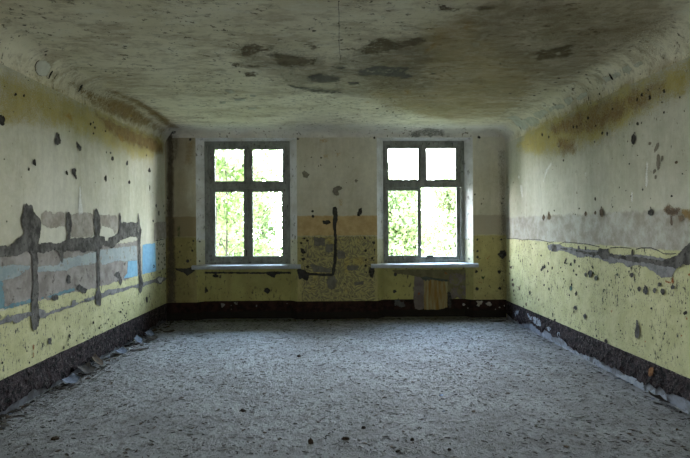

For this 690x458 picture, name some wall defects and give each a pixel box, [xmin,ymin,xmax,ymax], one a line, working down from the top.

water stain [228,0,690,181]
water stain [0,64,197,303]
rust [663,203,690,225]
peeling [0,197,168,325]
peeling [300,237,375,289]
peeling [392,269,466,310]
peeling [536,243,676,306]
peeling [62,373,80,383]
peeling [133,330,158,343]
peeling [514,291,670,403]